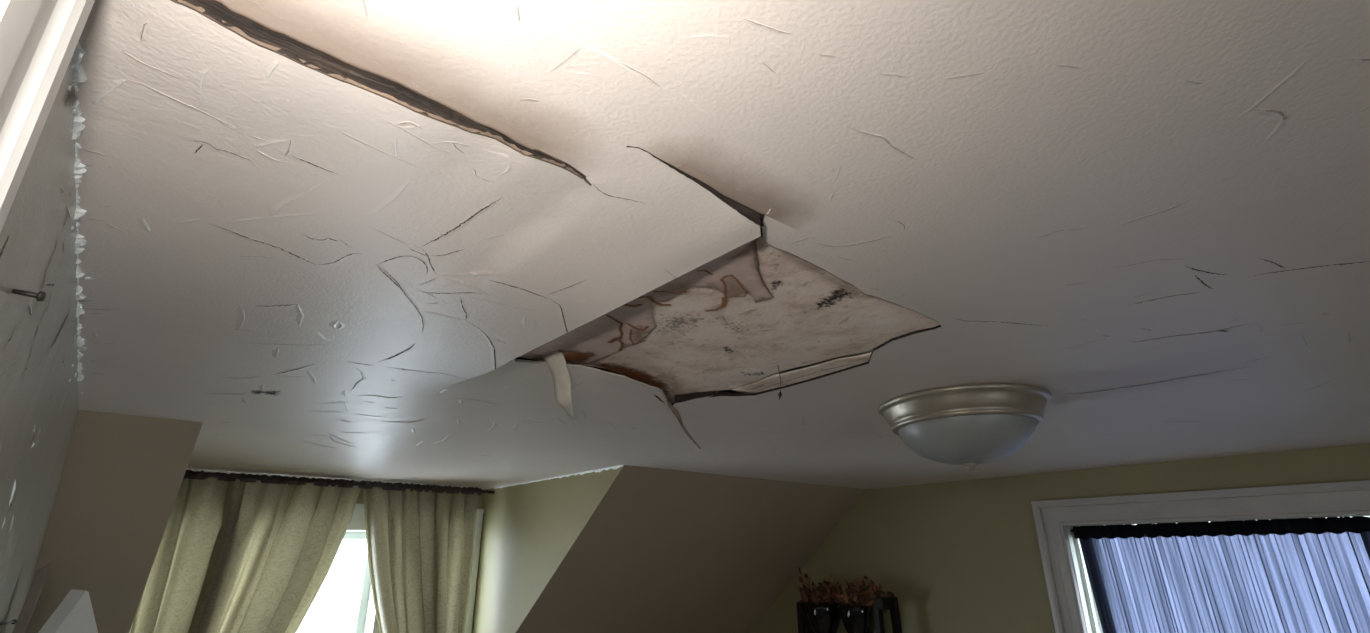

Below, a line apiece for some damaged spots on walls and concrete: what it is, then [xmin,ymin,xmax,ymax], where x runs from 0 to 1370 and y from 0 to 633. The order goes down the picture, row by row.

crack [170,0,646,204]
crack [627,146,771,238]
crack [420,197,504,248]
crack [211,224,468,380]
flaking render [515,353,547,365]
crack [487,279,586,333]
flaking render [566,214,940,410]
crack [1131,322,1256,342]
crack [1129,258,1370,305]